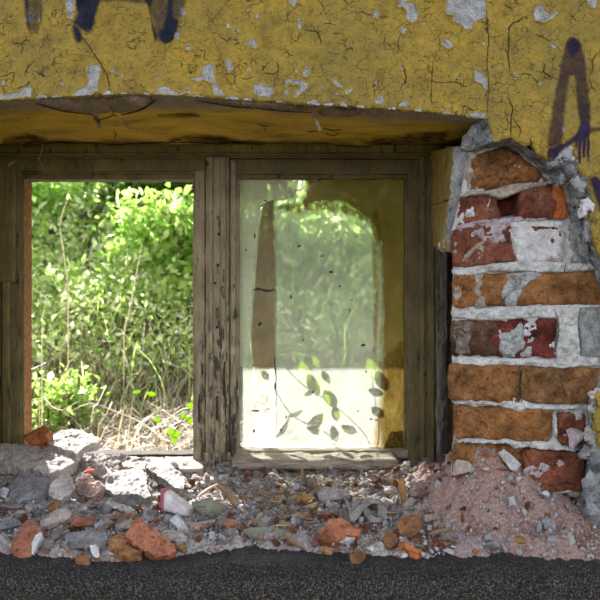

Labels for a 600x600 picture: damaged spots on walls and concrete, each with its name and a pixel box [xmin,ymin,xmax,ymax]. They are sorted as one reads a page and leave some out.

peeling [63,0,76,20]
peeling [444,0,488,31]
crack [0,37,55,89]
peeling [0,80,62,101]
crack [35,24,157,122]
peeling [71,62,123,98]
peeling [144,62,312,104]
crack [243,23,339,80]
crack [483,1,491,112]
crack [504,3,552,84]
crack [196,100,312,145]
flaking render [447,110,600,527]